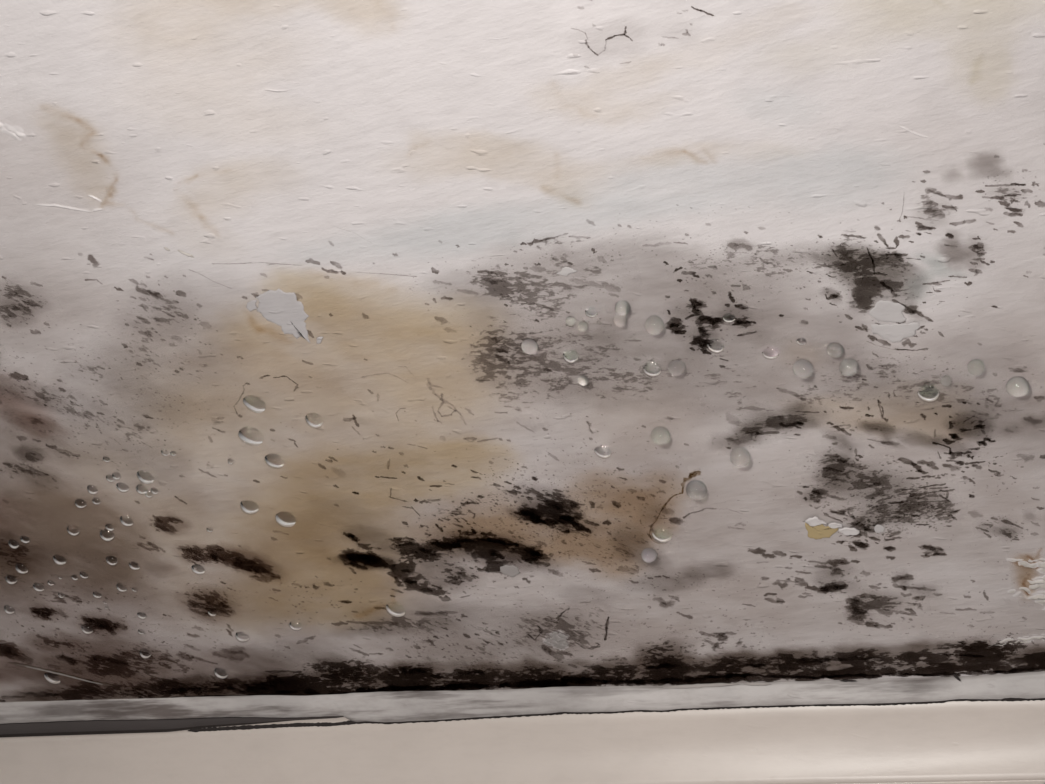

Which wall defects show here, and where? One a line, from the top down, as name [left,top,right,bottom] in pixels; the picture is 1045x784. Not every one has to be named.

mould [833,216,953,309]
flaking render [246,288,323,344]
leakage [660,293,756,367]
leakage [932,413,996,481]
mould [186,546,280,578]
mould [339,495,550,598]
mould [504,477,611,533]
spalling [804,517,860,539]
mould [829,523,897,567]
mould [86,618,116,630]
mould [805,585,892,627]
leakage [39,633,1045,700]